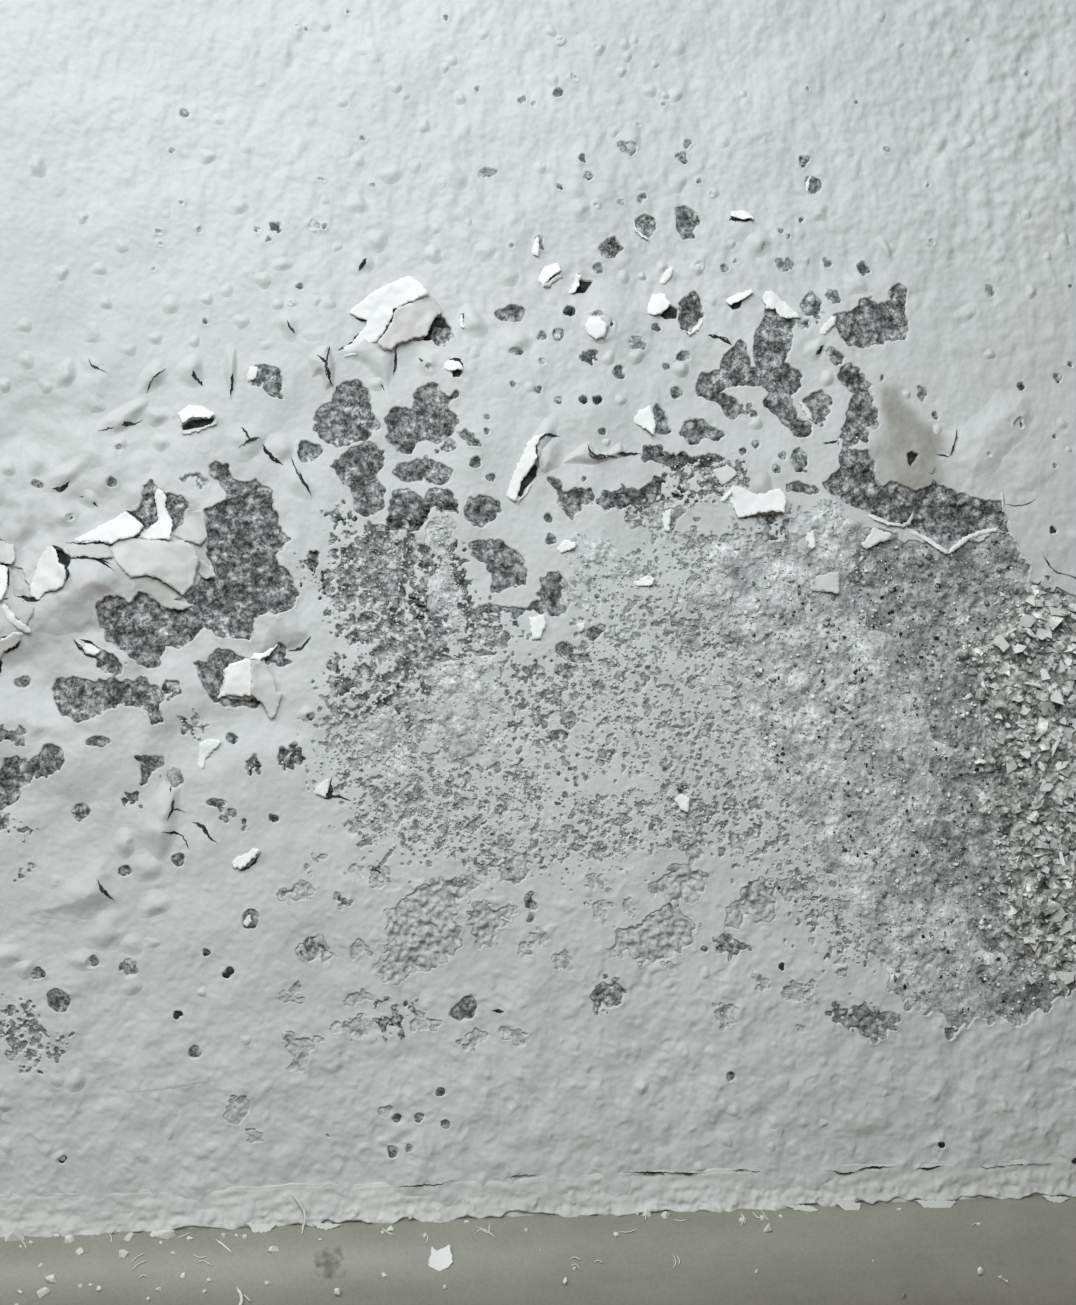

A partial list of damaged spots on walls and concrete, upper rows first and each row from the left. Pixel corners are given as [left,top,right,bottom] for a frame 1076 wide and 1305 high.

peeling [531,235,624,342]
flaking render [0,267,1076,1074]
crack [623,1168,760,1176]
crack [827,1158,1076,1175]